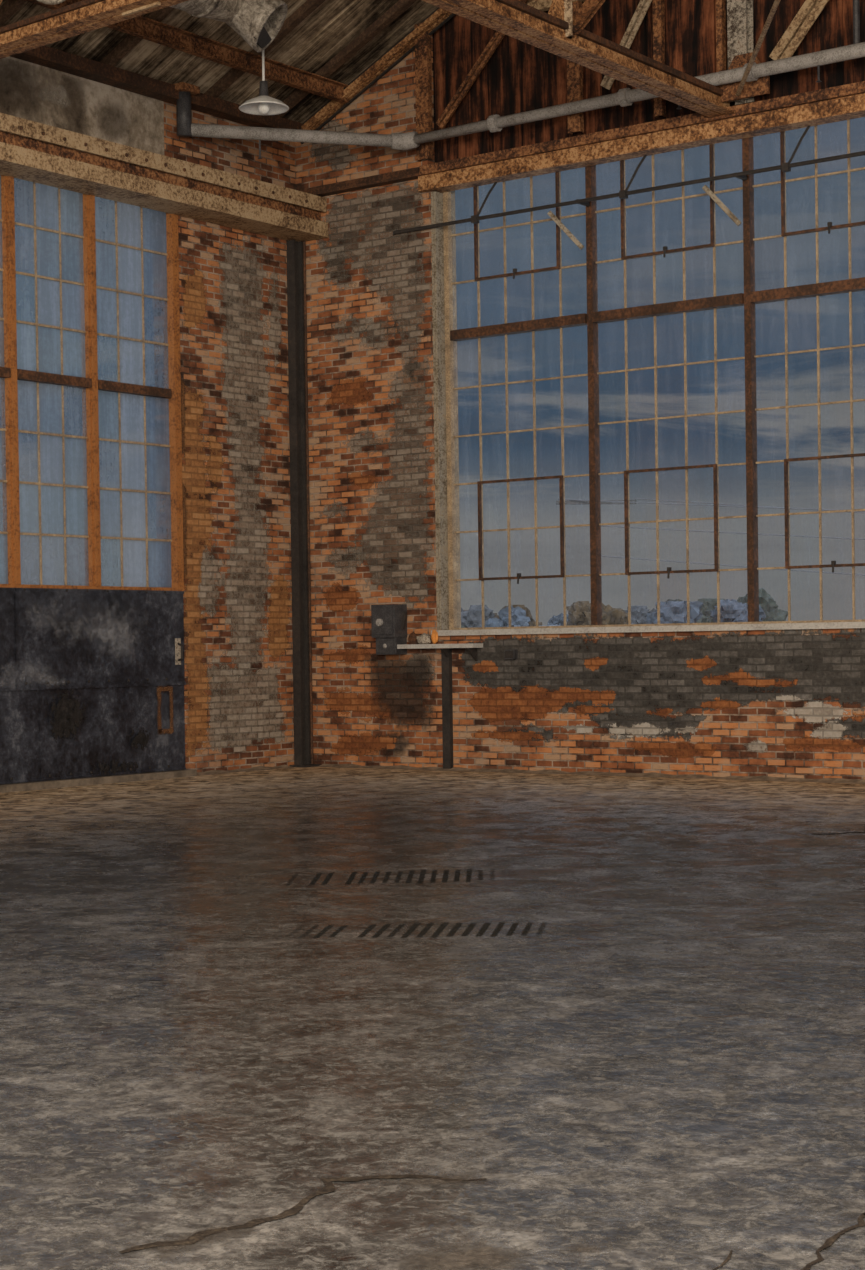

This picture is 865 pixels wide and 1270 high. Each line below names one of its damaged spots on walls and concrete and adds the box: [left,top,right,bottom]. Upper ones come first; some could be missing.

peeling [460,628,865,759]
crack [119,1174,487,1253]
crack [712,1250,733,1270]
crack [801,1212,865,1270]